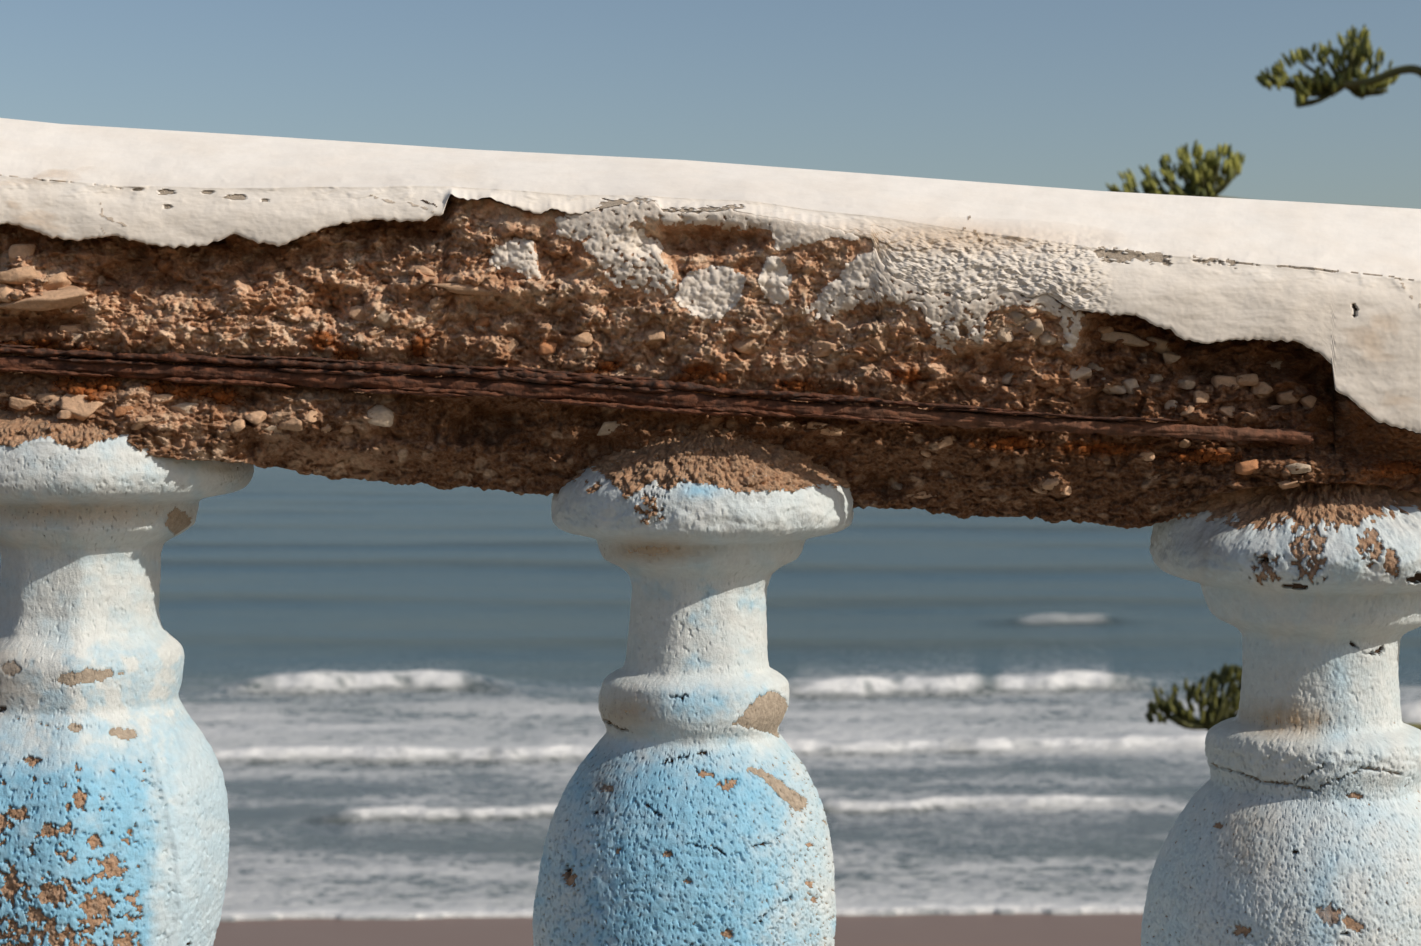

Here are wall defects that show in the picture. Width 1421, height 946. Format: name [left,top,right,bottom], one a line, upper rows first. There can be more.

rust [0,339,93,357]
rust [310,331,359,360]
rust [583,360,621,374]
rust [53,377,120,402]
rust [147,380,241,405]
spalling [0,194,1421,585]
peeling [57,667,124,687]
peeling [732,691,789,738]
peeling [109,727,137,741]
crack [1211,762,1402,789]
peeling [0,756,144,946]
peeling [682,751,835,946]